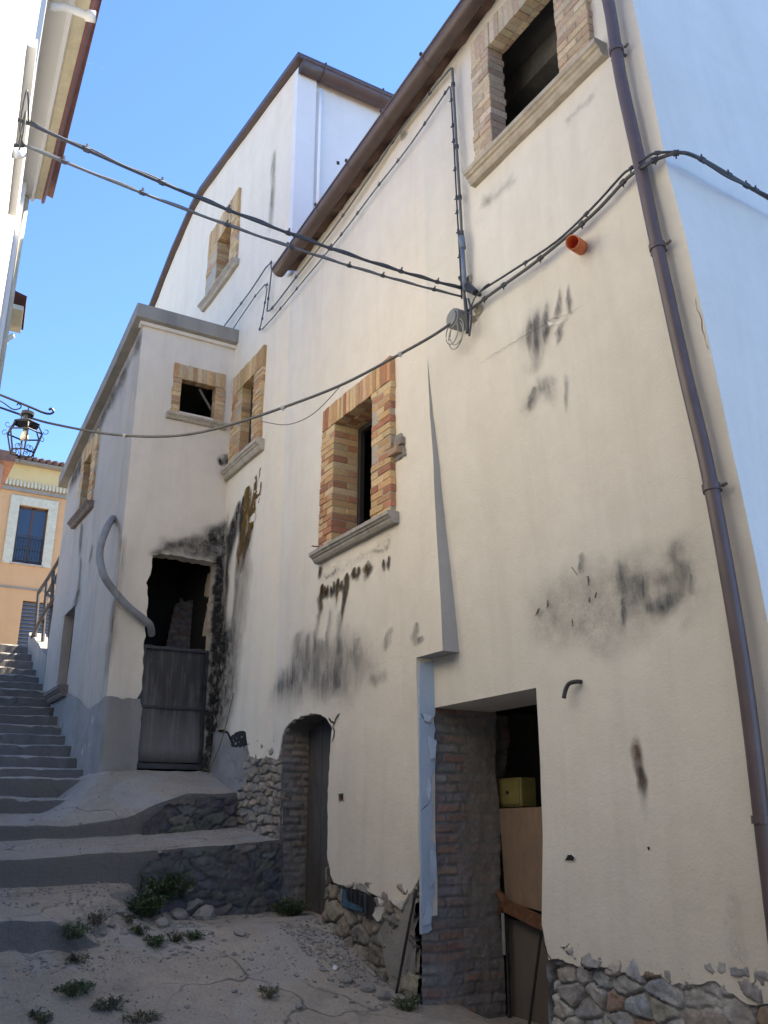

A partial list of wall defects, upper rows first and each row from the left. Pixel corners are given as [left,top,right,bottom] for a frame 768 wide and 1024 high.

water stain [527,292,570,348]
water stain [318,556,390,618]
water stain [619,568,680,622]
spalling [210,731,287,842]
spalling [321,661,437,1005]
spalling [546,943,768,1024]